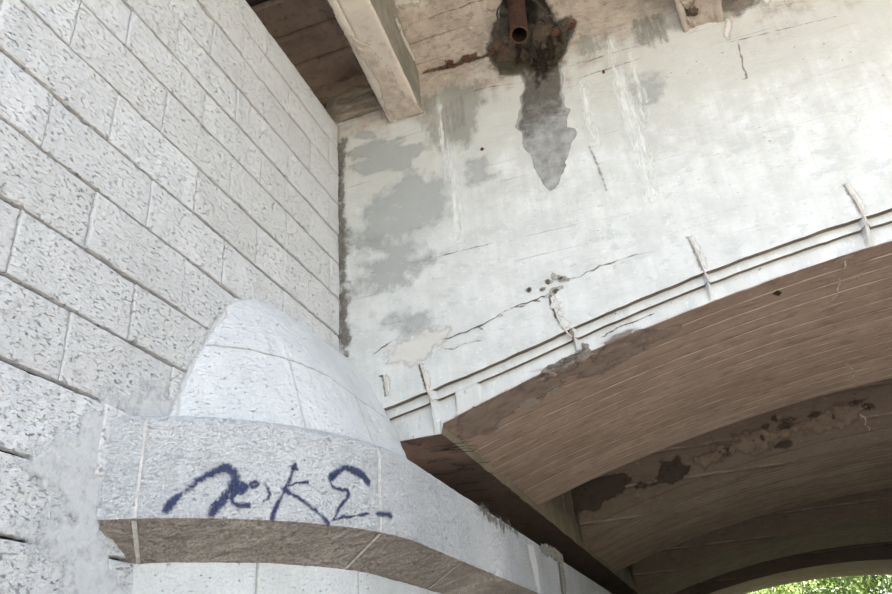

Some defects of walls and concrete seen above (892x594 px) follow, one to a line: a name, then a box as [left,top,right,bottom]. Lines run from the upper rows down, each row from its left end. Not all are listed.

spalling [680,0,699,28]
water stain [722,0,769,40]
crack [731,23,807,79]
water stain [486,0,661,198]
crack [446,294,548,350]
spalling [457,273,681,440]